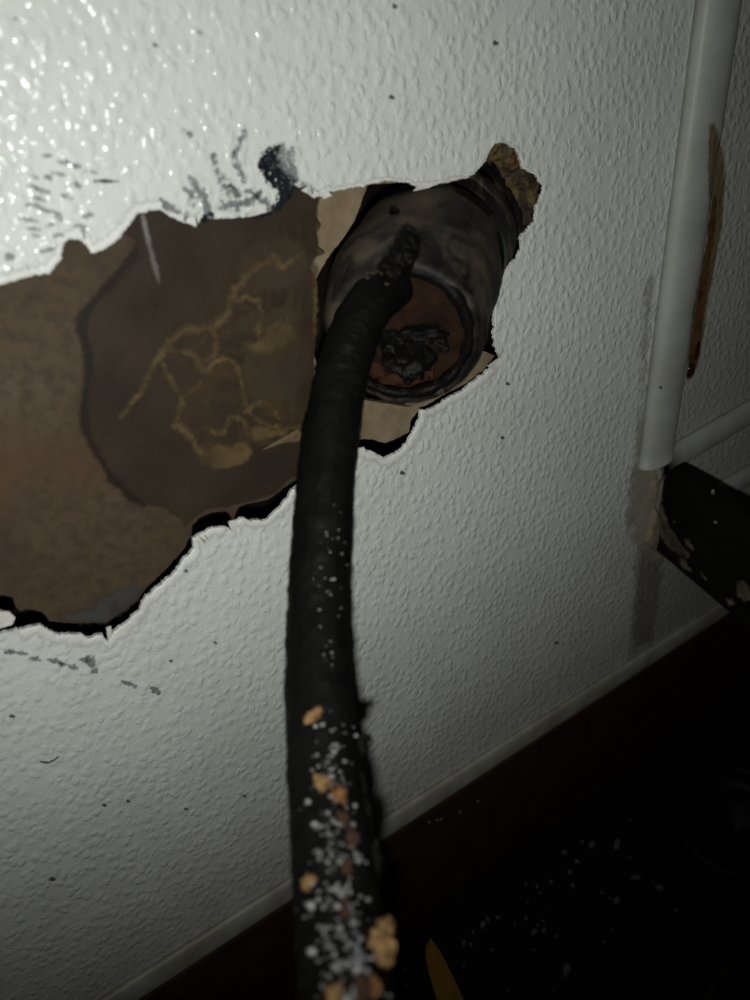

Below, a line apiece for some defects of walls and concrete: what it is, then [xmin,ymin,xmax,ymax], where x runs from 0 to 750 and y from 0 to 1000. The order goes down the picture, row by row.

peeling [301,186,331,199]
peeling [412,182,436,191]
peeling [246,203,266,217]
peeling [488,357,504,370]
peeling [0,611,15,627]